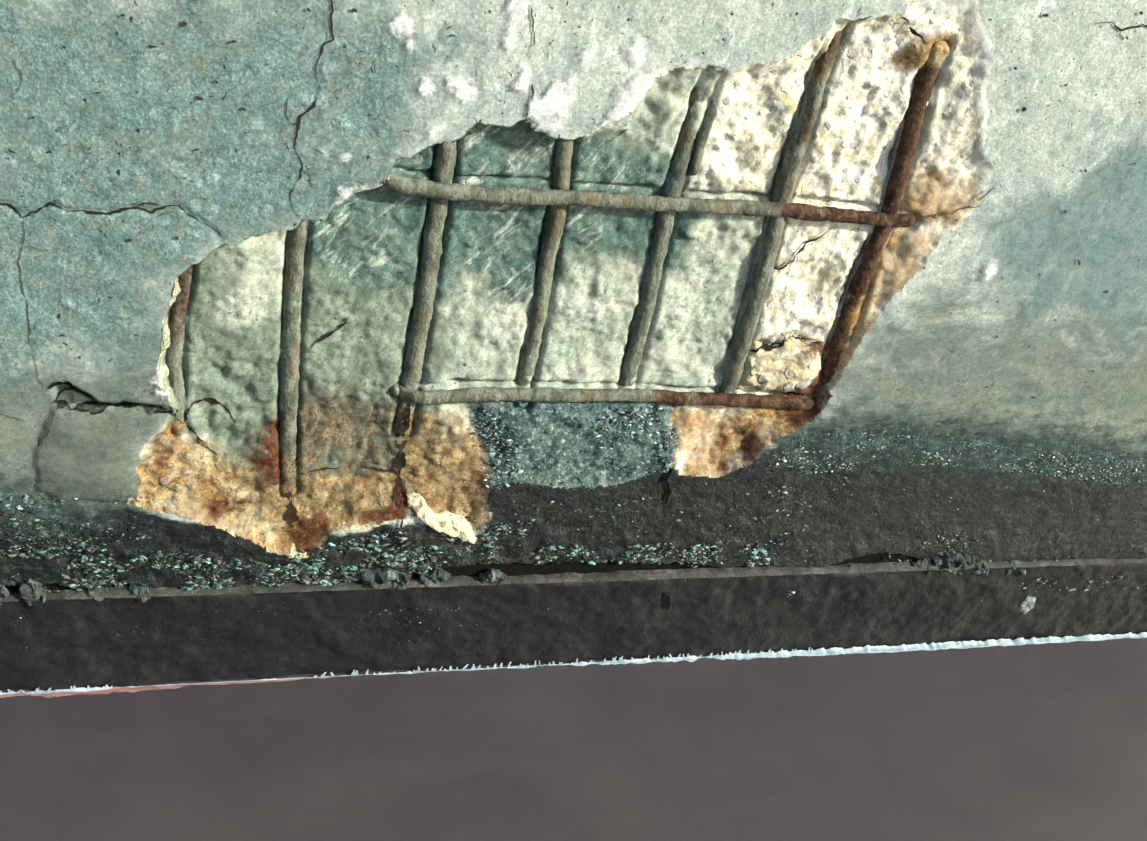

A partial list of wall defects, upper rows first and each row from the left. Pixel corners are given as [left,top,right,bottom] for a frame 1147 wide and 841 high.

crack [286,0,335,211]
corrosion [891,32,951,69]
crack [0,202,237,456]
spalling [135,247,240,497]
spalling [187,510,240,536]
spalling [237,219,323,463]
spalling [267,543,309,558]
corrosion [134,380,490,555]
crack [308,317,348,354]
spalling [324,520,388,537]
spalling [336,0,995,544]
corrosion [670,172,980,477]